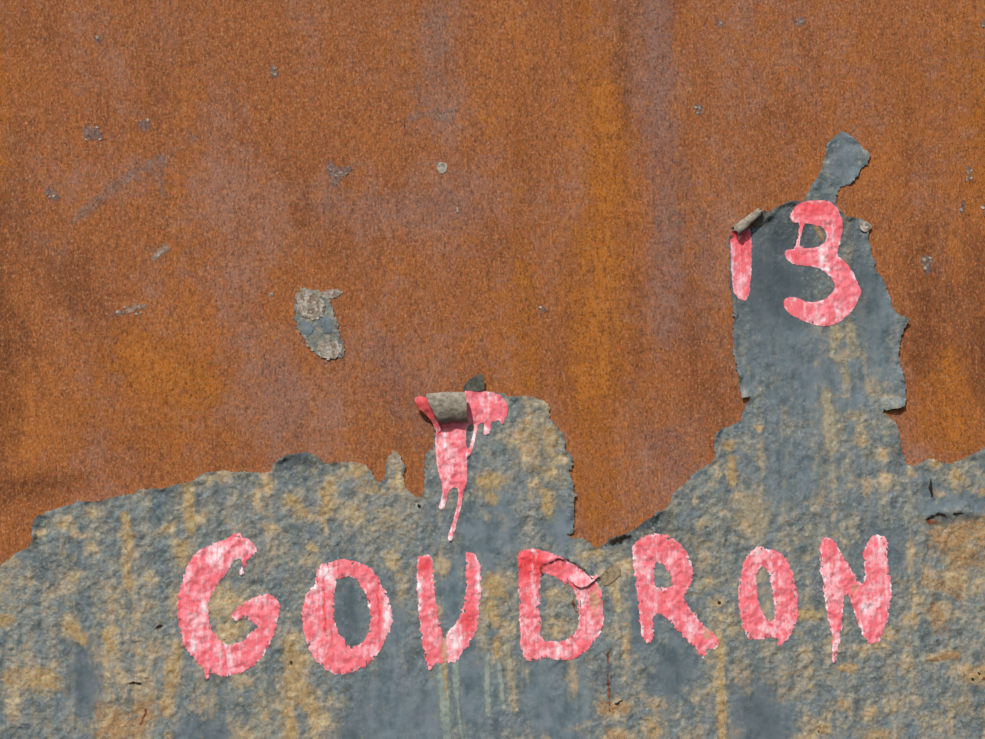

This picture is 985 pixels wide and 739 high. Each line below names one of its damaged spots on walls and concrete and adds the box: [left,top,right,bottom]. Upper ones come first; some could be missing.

peeling [731,207,763,236]
rust [566,80,627,452]
peeling [426,374,491,427]
peeling [466,424,474,449]
rust [723,441,737,487]
rust [821,389,838,456]
rust [120,511,134,590]
peeling [332,574,373,649]
peeling [536,572,582,643]
spalling [609,535,631,546]
peeling [653,562,673,591]
peeling [756,564,777,622]